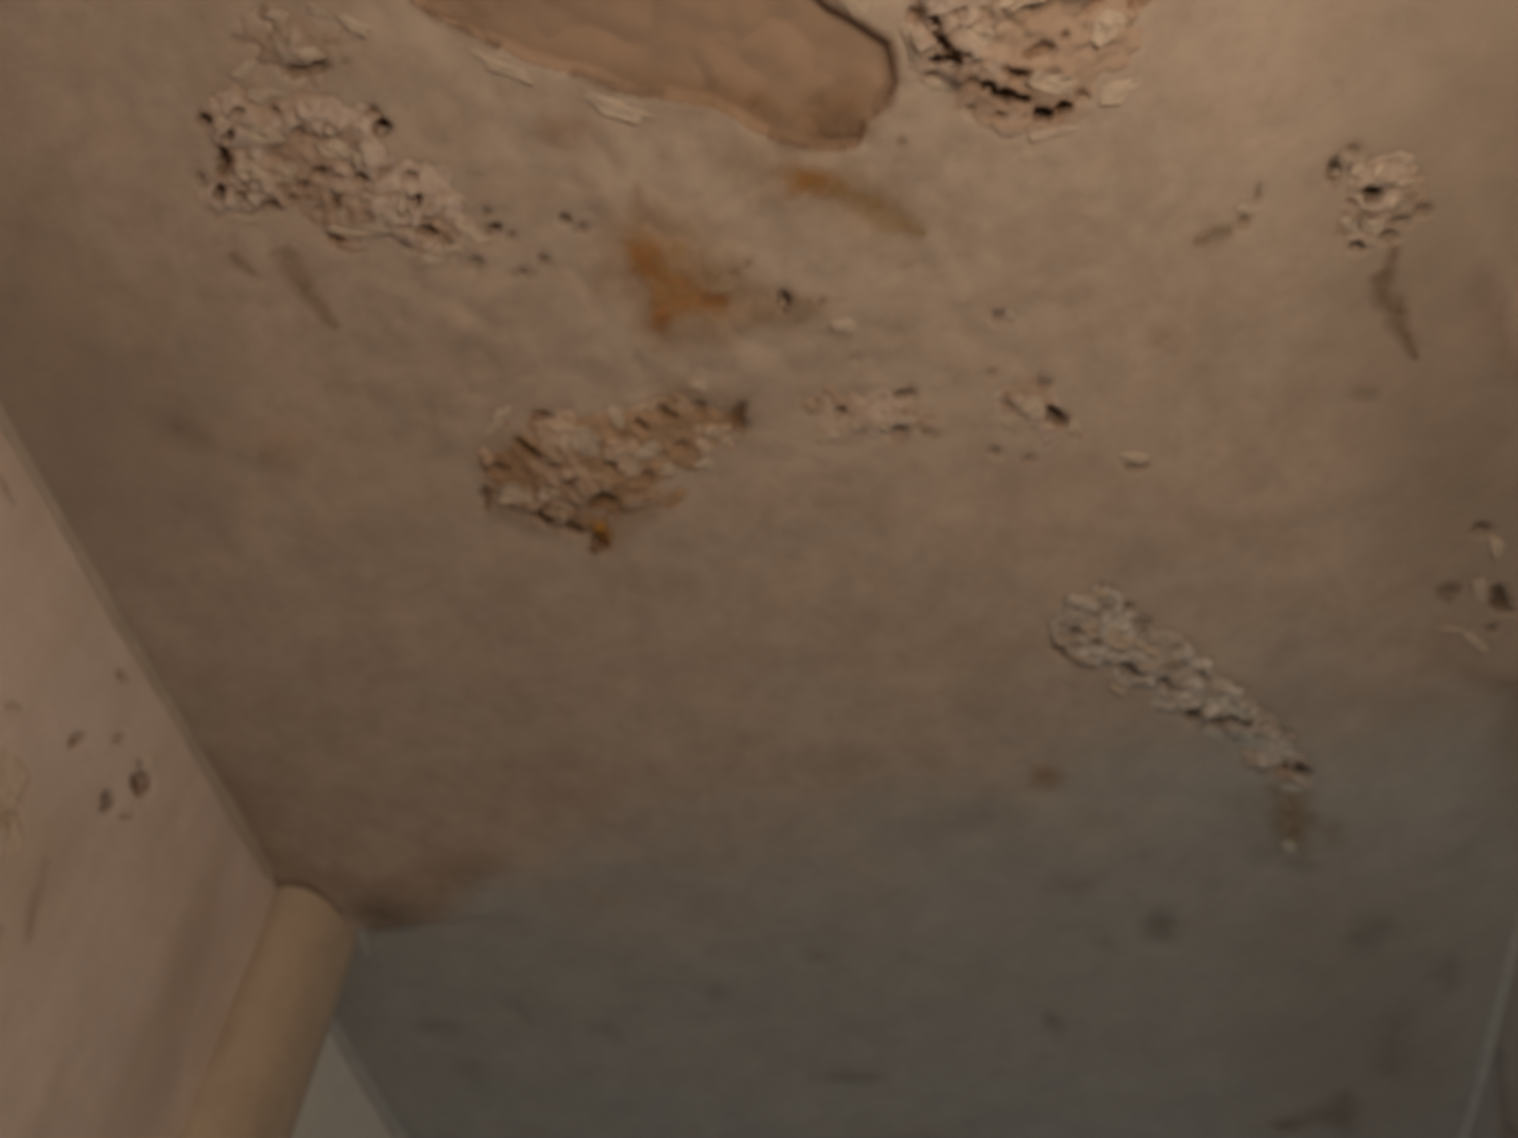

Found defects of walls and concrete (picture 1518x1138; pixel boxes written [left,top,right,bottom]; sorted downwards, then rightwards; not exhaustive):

peeling [194,2,500,268]
spalling [410,0,1148,152]
spalling [1329,150,1431,248]
peeling [476,376,746,552]